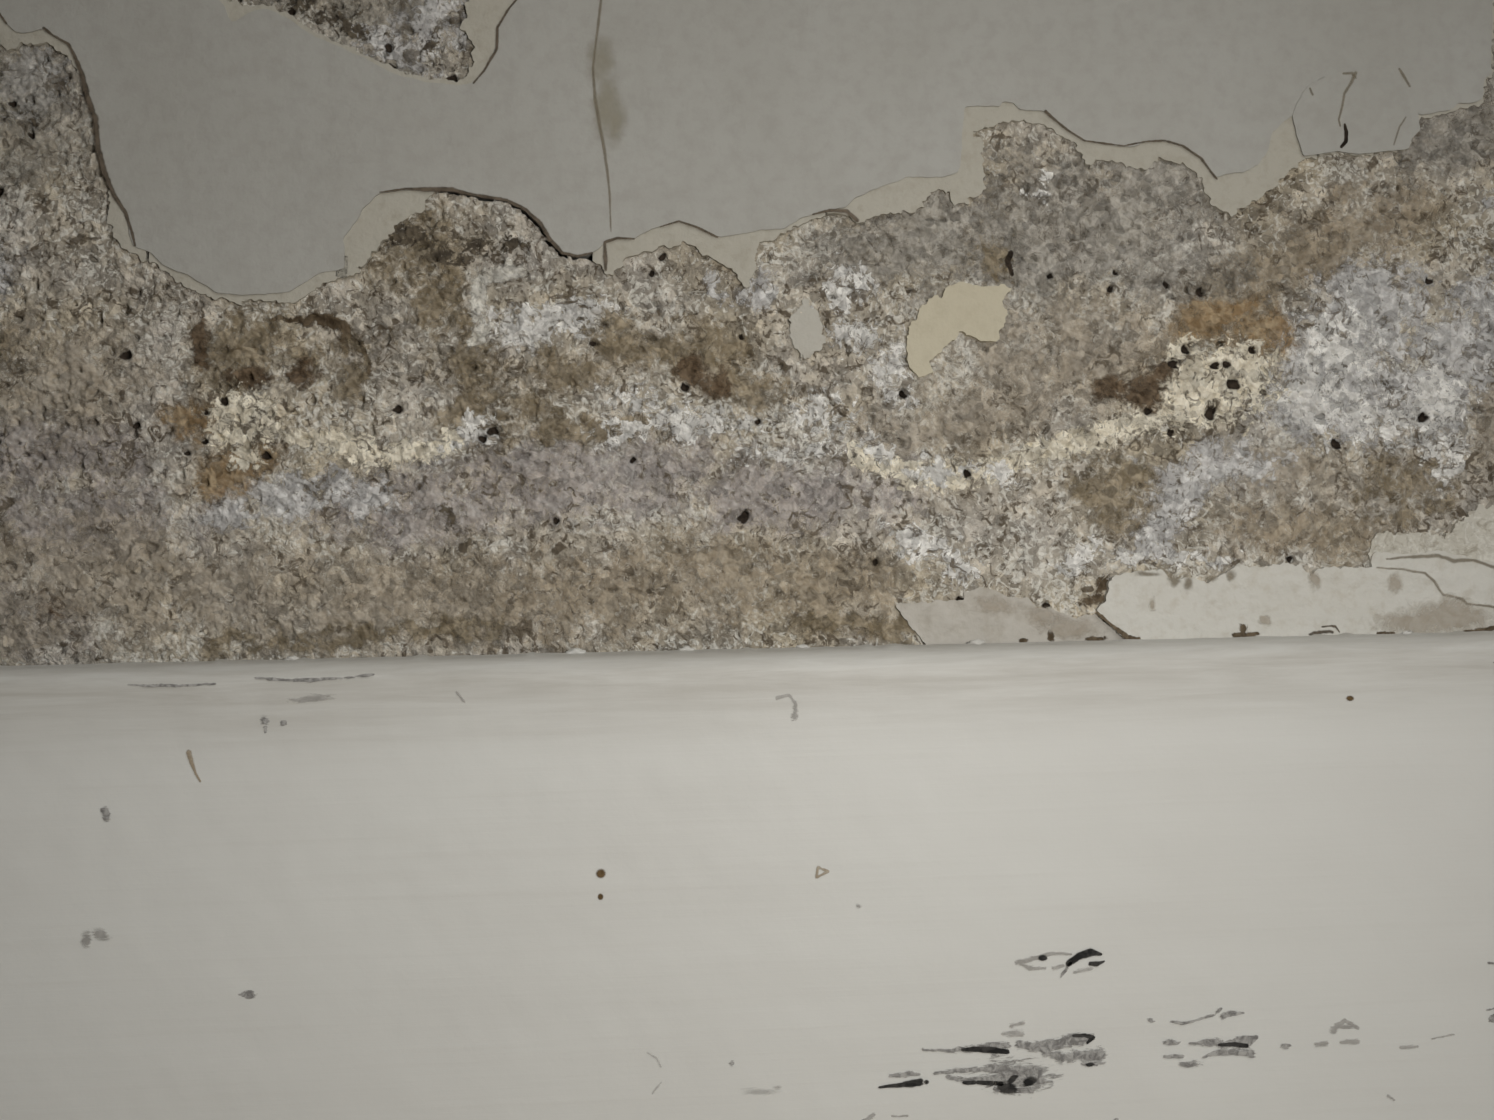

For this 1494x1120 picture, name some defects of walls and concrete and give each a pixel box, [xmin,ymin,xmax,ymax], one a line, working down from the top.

crack [379,0,718,271]
flaking render [0,0,1494,666]